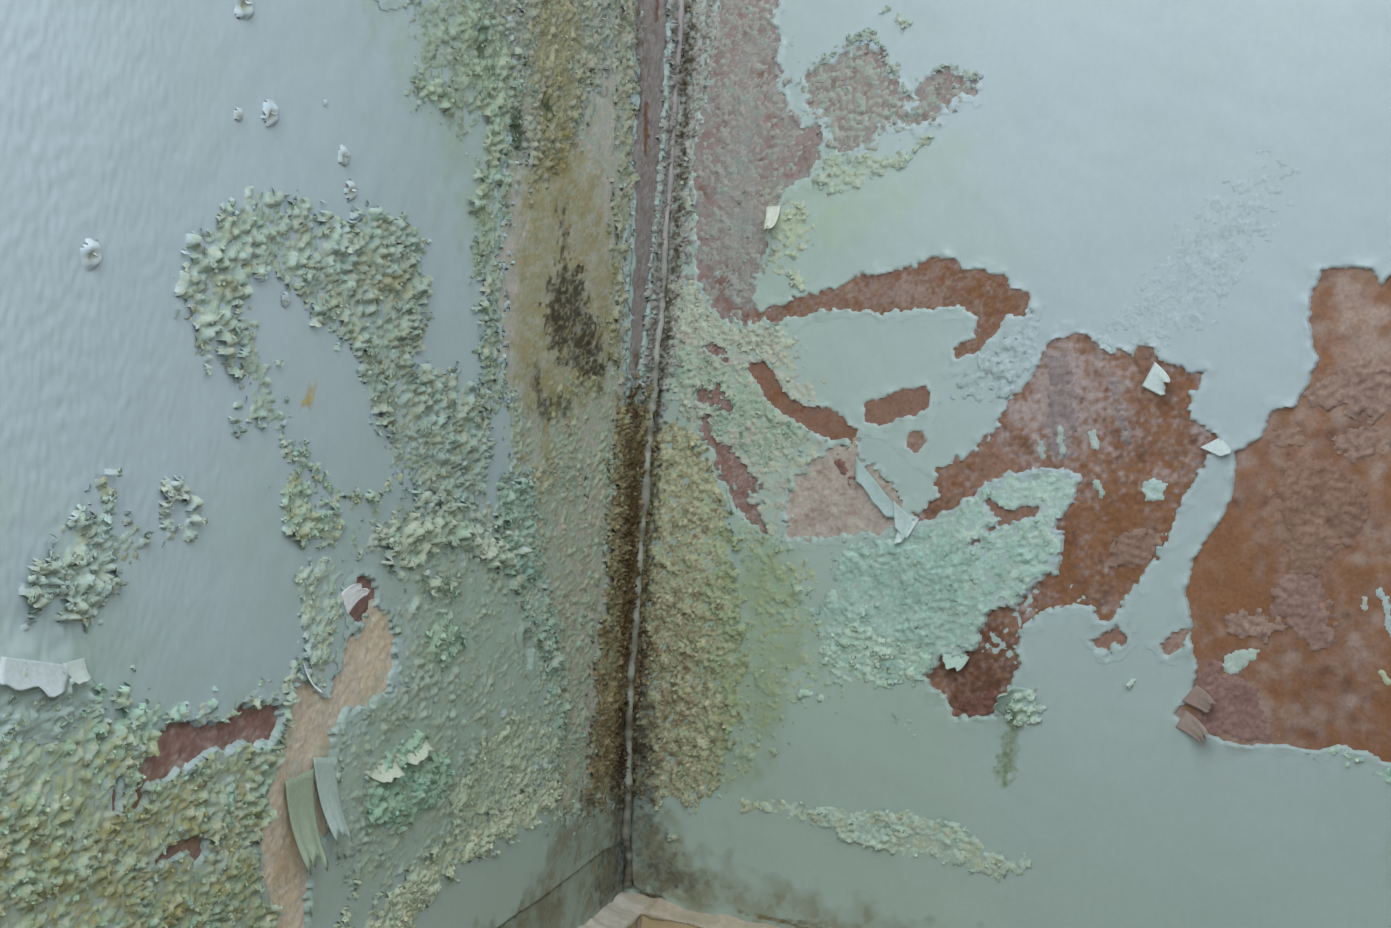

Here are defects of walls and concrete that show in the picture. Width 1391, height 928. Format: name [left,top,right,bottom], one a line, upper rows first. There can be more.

peeling [95,562,404,928]
damp [510,116,527,149]
damp [539,208,610,390]
peeling [492,0,676,840]
damp [596,1,697,904]
peeling [681,0,1391,776]